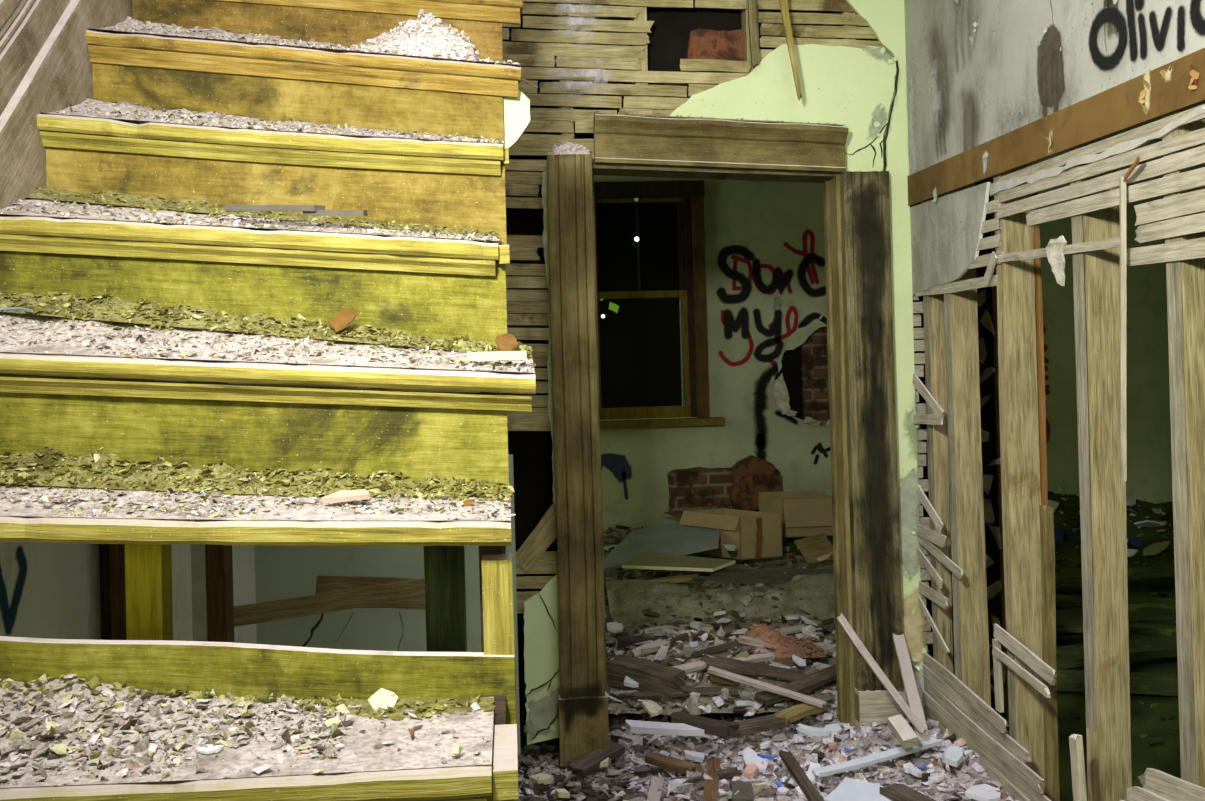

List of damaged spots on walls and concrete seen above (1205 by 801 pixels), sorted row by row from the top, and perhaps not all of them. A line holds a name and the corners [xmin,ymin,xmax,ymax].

damp [1103,0,1118,36]
crack [845,59,901,171]
spalling [869,103,887,137]
damp [1037,25,1065,117]
peeling [1138,65,1172,115]
peeling [1188,66,1200,89]
spalling [994,105,1205,193]
spalling [770,311,830,427]
crack [302,612,354,647]
spalling [525,689,560,740]